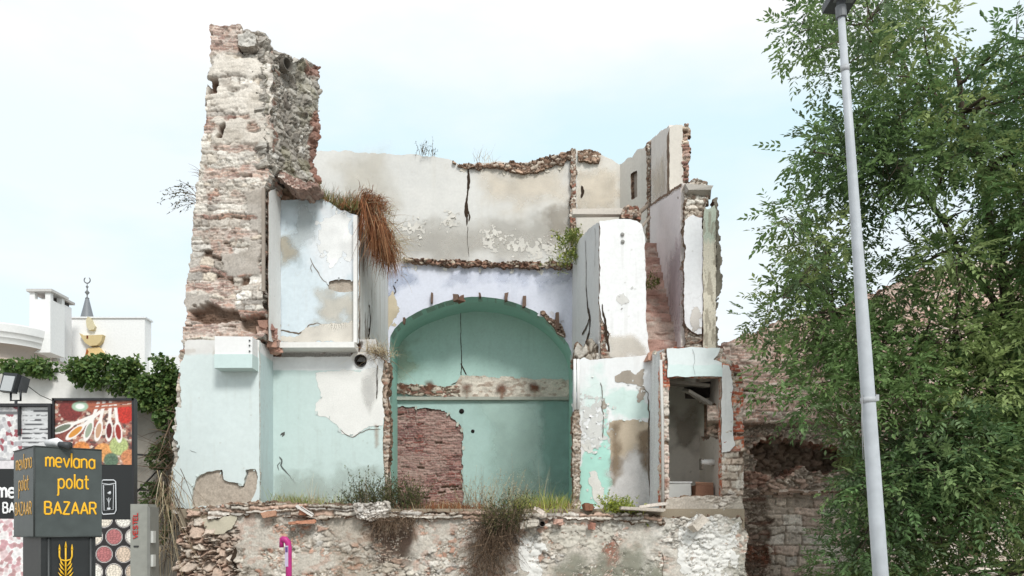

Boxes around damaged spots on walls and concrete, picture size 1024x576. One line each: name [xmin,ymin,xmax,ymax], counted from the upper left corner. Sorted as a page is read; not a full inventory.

peeling [315,210,360,296]
crack [463,169,471,254]
spalling [400,210,573,275]
crack [451,313,467,385]
peeling [315,367,385,438]
flaking render [615,369,646,403]
flaking render [191,469,261,507]
flaking render [397,375,650,530]
damp [601,425,650,509]